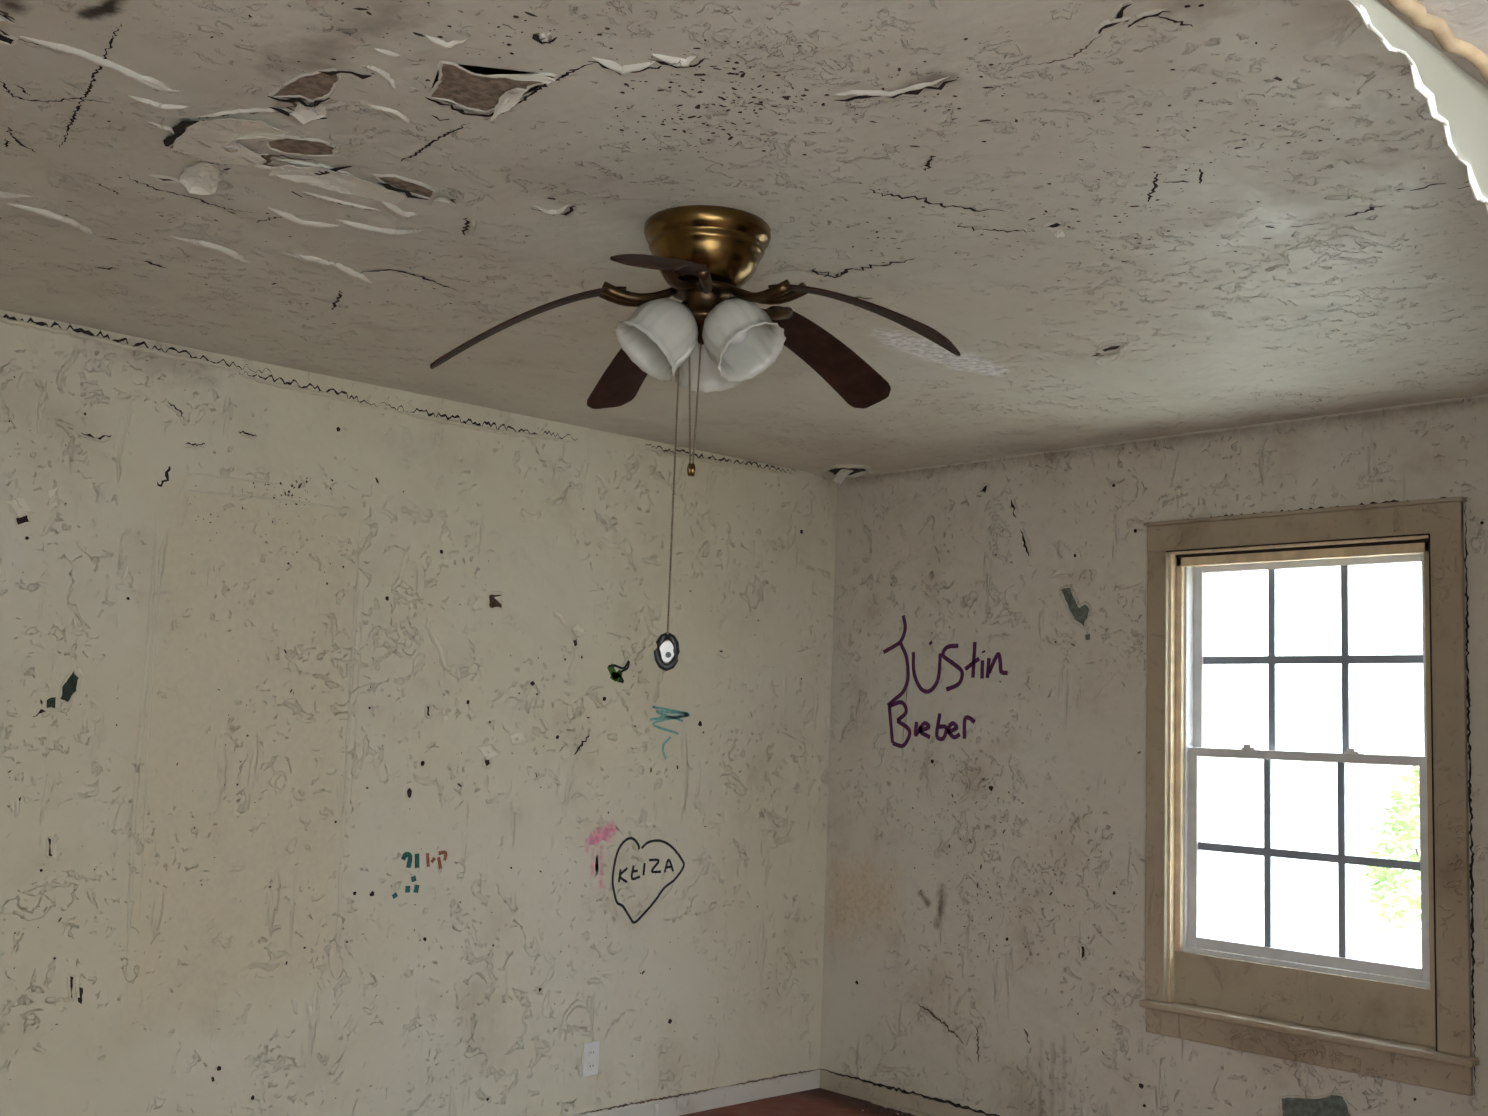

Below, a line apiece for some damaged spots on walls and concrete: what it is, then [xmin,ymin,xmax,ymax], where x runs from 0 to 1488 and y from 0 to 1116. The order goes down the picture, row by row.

peeling [147,61,596,212]
crack [1026,4,1193,65]
peeling [1349,0,1488,212]
flaking render [1279,1092,1354,1116]